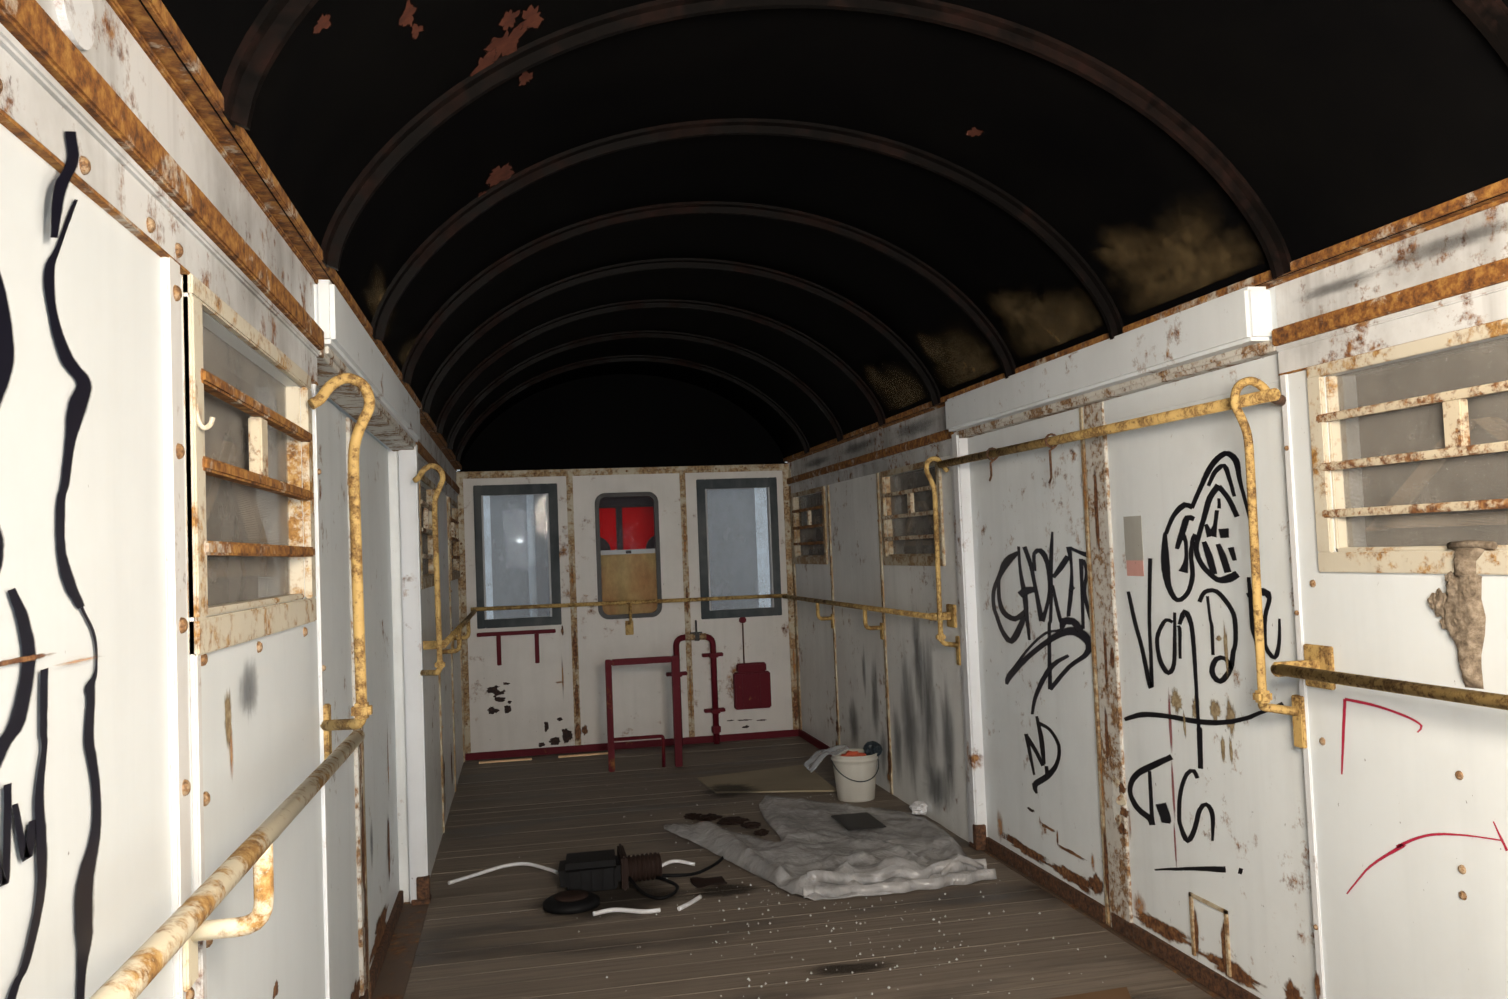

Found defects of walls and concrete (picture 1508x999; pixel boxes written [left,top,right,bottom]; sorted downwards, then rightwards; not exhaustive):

peeling [470,5,543,77]
peeling [519,71,533,86]
corrosion [0,108,190,275]
damp [1104,227,1231,297]
damp [998,297,1081,345]
corrosion [1083,465,1100,551]
corrosion [1090,582,1114,688]
peeling [487,682,512,714]
peeling [539,717,588,747]
damp [883,628,952,801]
corrosion [1135,897,1260,991]
corrosion [1284,971,1320,999]